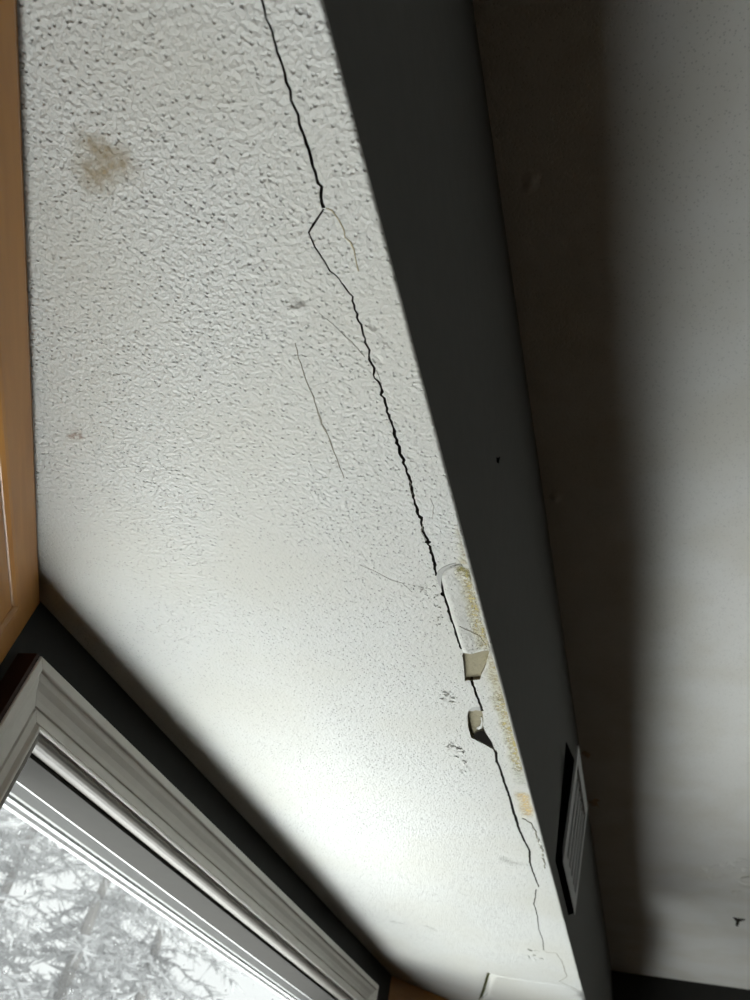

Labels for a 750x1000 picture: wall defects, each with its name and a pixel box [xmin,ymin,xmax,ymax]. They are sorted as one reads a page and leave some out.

crack [261,0,462,649]
flaking render [462,650,490,681]
crack [470,677,484,711]
flaking render [467,702,497,752]
crack [493,749,582,992]
crack [479,973,490,999]